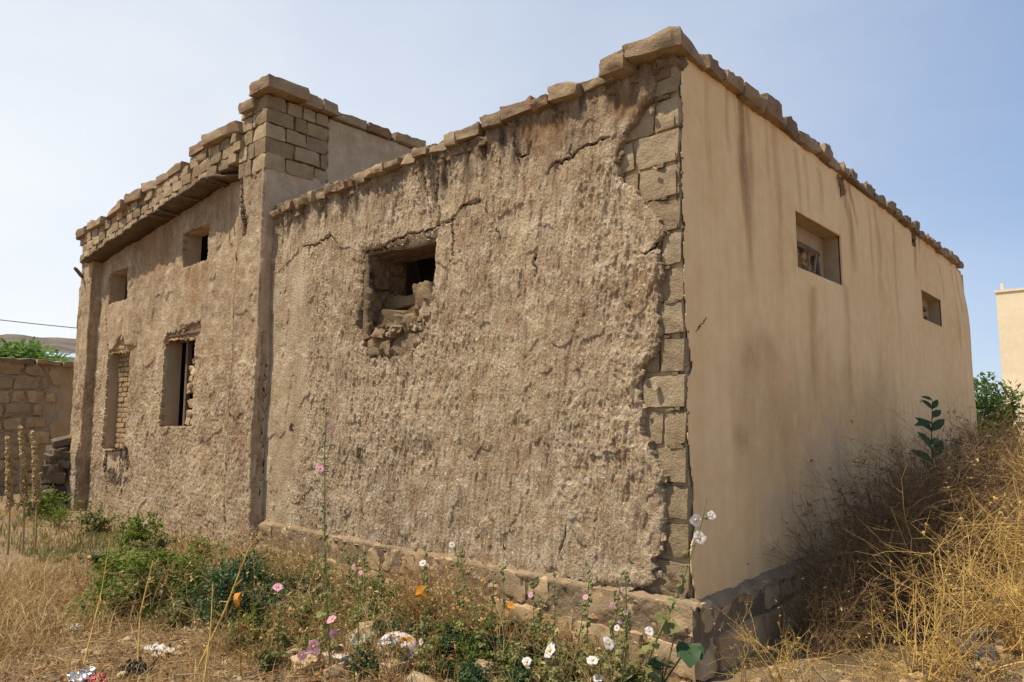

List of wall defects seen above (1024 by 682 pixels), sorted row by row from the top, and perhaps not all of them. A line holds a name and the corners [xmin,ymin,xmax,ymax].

crack [553,139,606,167]
crack [366,171,481,255]
spalling [163,319,201,349]
spalling [367,324,423,363]
spalling [618,65,694,600]
spalling [103,444,131,492]